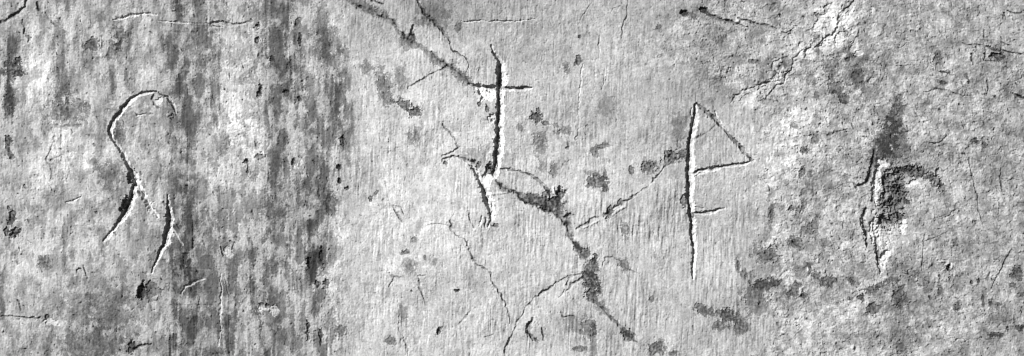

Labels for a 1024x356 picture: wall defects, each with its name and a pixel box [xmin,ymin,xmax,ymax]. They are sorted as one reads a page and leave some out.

crack [344,0,475,90]
crack [577,0,629,39]
crack [729,0,858,105]
damp [43,0,424,356]
crack [442,123,459,147]
crack [826,88,849,137]
crack [392,155,686,356]
crack [380,270,426,356]